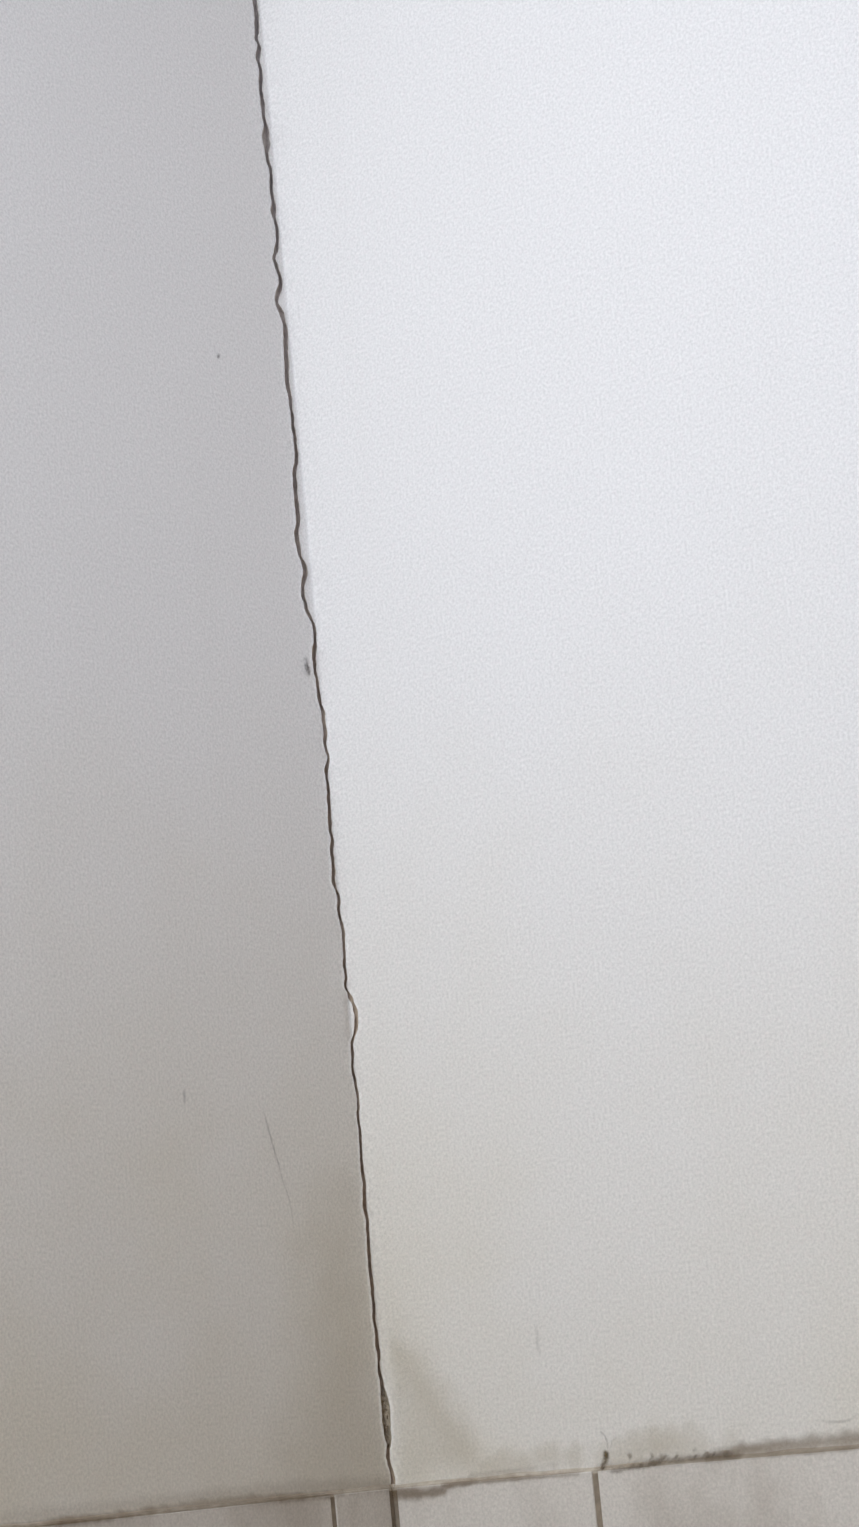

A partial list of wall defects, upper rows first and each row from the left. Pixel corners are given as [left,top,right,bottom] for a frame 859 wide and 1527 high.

crack [252,0,395,1484]